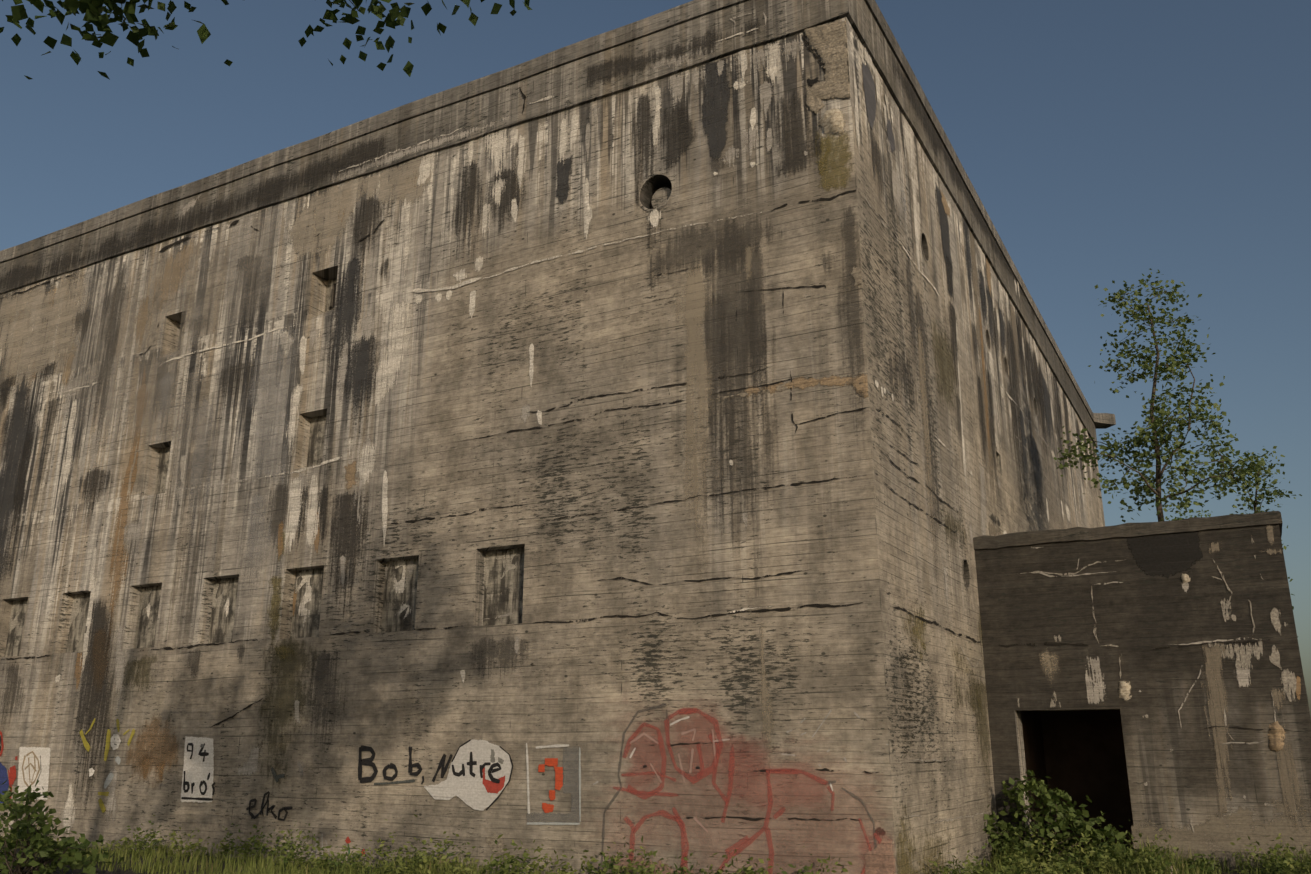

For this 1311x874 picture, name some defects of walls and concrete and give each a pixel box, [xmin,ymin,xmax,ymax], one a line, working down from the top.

leakage [0,18,1097,661]
rust [109,368,148,646]
leakage [1126,531,1220,578]
leakage [1261,525,1282,555]
crack [535,547,1123,679]
leakage [1221,598,1236,622]
leakage [1,664,23,719]
leakage [189,650,200,676]
leakage [460,637,524,683]
leakage [1042,652,1061,708]
leakage [1085,656,1106,705]
crack [1153,540,1298,744]